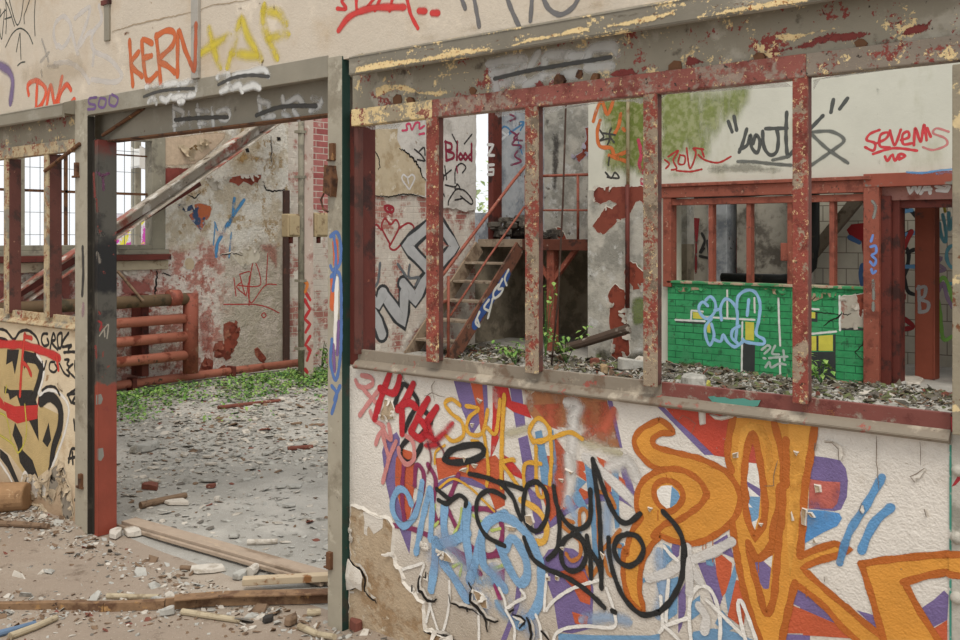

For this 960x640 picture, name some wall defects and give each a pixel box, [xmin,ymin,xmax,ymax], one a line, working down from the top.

peeling [514,26,589,46]
peeling [607,10,675,27]
peeling [716,0,807,15]
peeling [763,28,871,53]
peeling [901,20,932,36]
peeling [592,185,643,235]
peeling [607,261,643,360]
peeling [199,320,240,377]
peeling [254,347,266,363]
peeling [21,459,73,521]
crack [349,558,377,603]
flaking render [345,504,454,640]